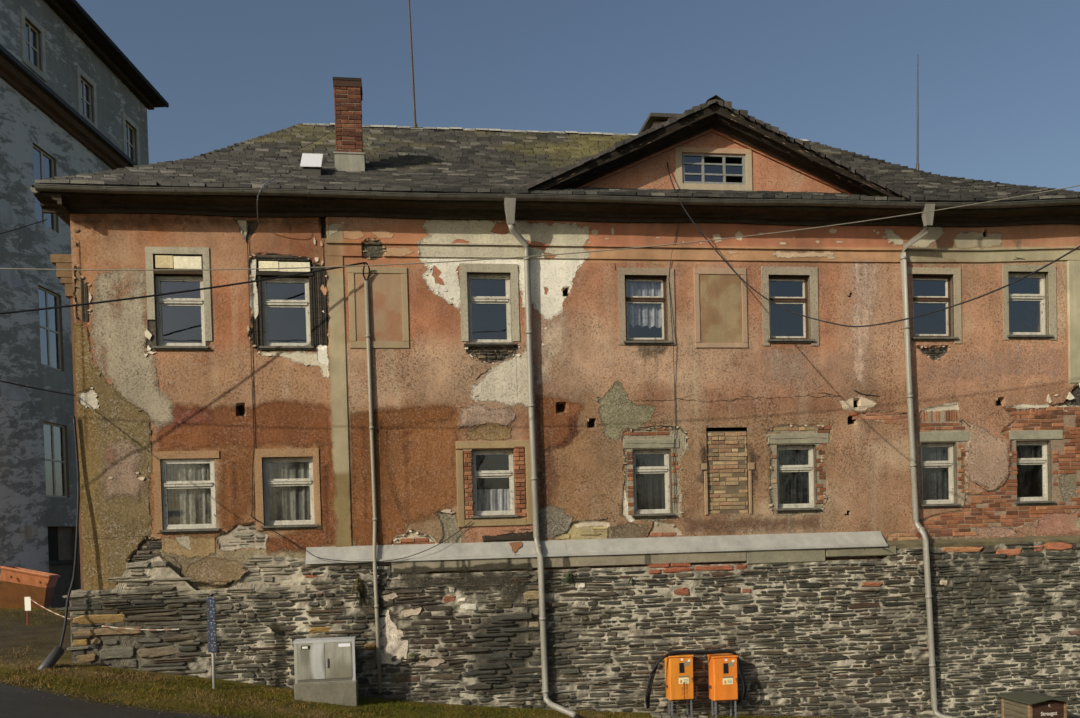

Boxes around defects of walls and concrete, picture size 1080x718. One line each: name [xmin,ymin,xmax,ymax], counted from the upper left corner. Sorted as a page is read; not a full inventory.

peeling [699,230,743,254]
flaking render [73,267,173,434]
flaking render [236,218,615,407]
flaking render [621,425,690,537]
flaking render [766,424,832,516]
flaking render [848,383,1080,541]
flaking render [127,522,268,575]
flaking render [391,530,438,545]
flaking render [554,518,611,540]